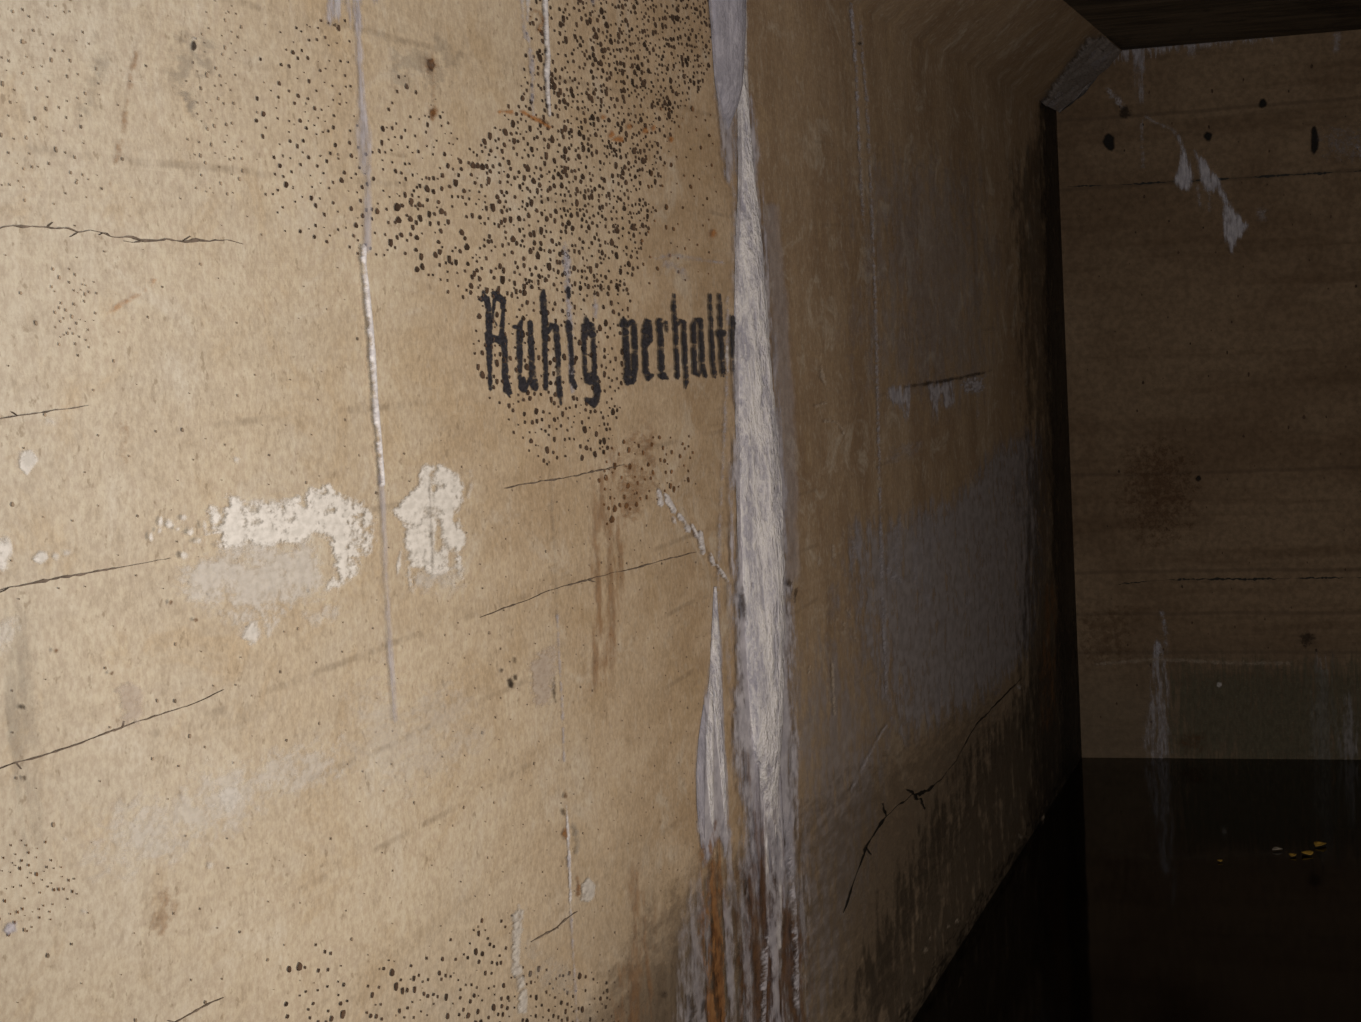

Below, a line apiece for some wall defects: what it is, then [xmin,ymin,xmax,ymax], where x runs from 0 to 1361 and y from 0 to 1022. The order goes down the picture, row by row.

crack [0,222,242,244]
water stain [1175,141,1247,252]
water stain [362,200,385,511]
peeling [0,538,12,569]
peeling [34,552,57,563]
crack [0,558,170,593]
peeling [150,484,373,643]
peeling [394,465,466,586]
crack [0,689,225,769]
crack [843,678,1022,913]